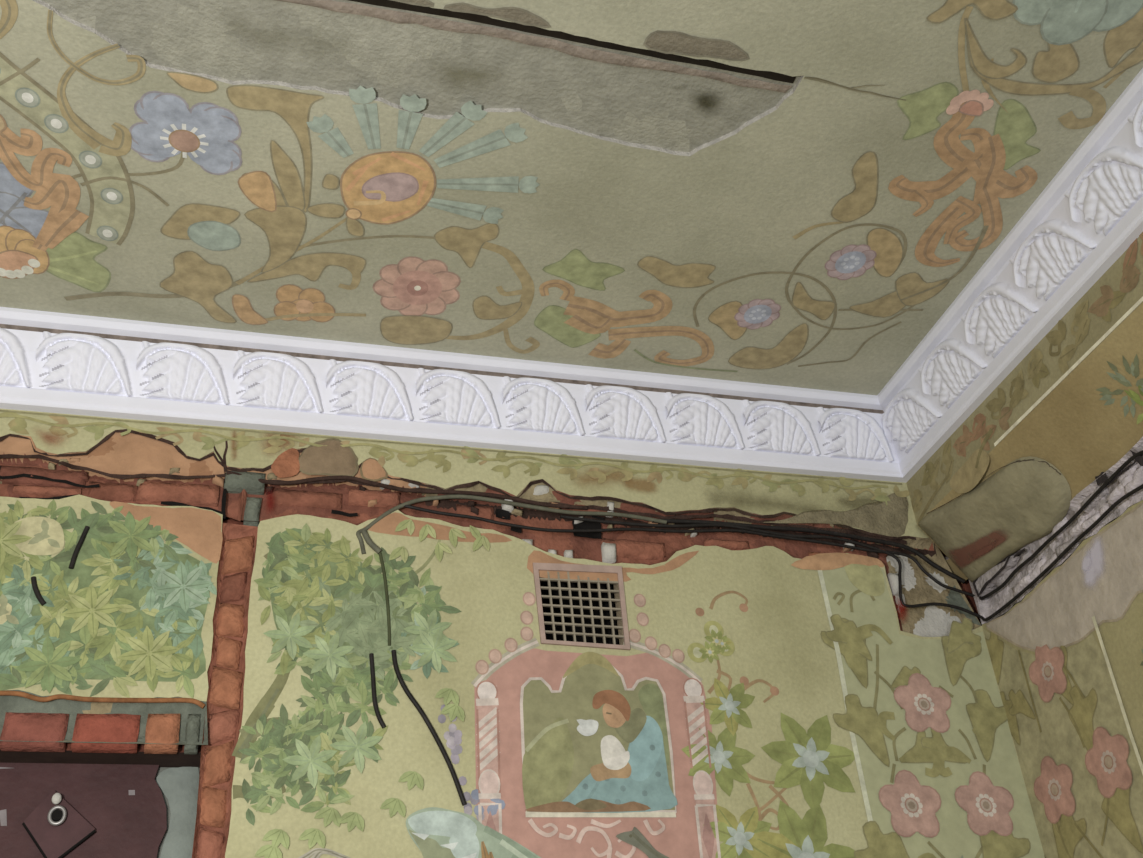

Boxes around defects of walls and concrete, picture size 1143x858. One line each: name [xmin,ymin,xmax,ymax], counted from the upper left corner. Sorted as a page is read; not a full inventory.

peeling [41,0,801,152]
crack [804,77,906,101]
flaking render [0,429,1143,858]